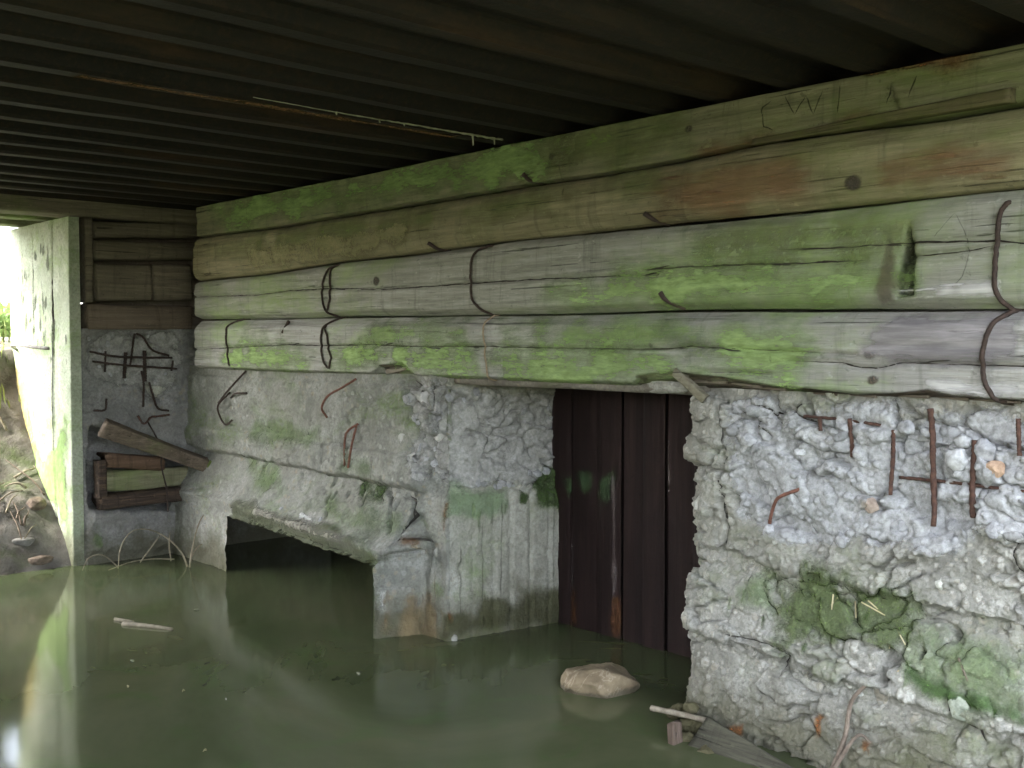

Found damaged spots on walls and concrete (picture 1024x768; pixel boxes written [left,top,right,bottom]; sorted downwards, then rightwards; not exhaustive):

spalling [379,363,555,490]
spalling [634,371,1024,554]
crack [391,487,434,543]
damp [443,587,559,637]
rust [611,598,621,635]